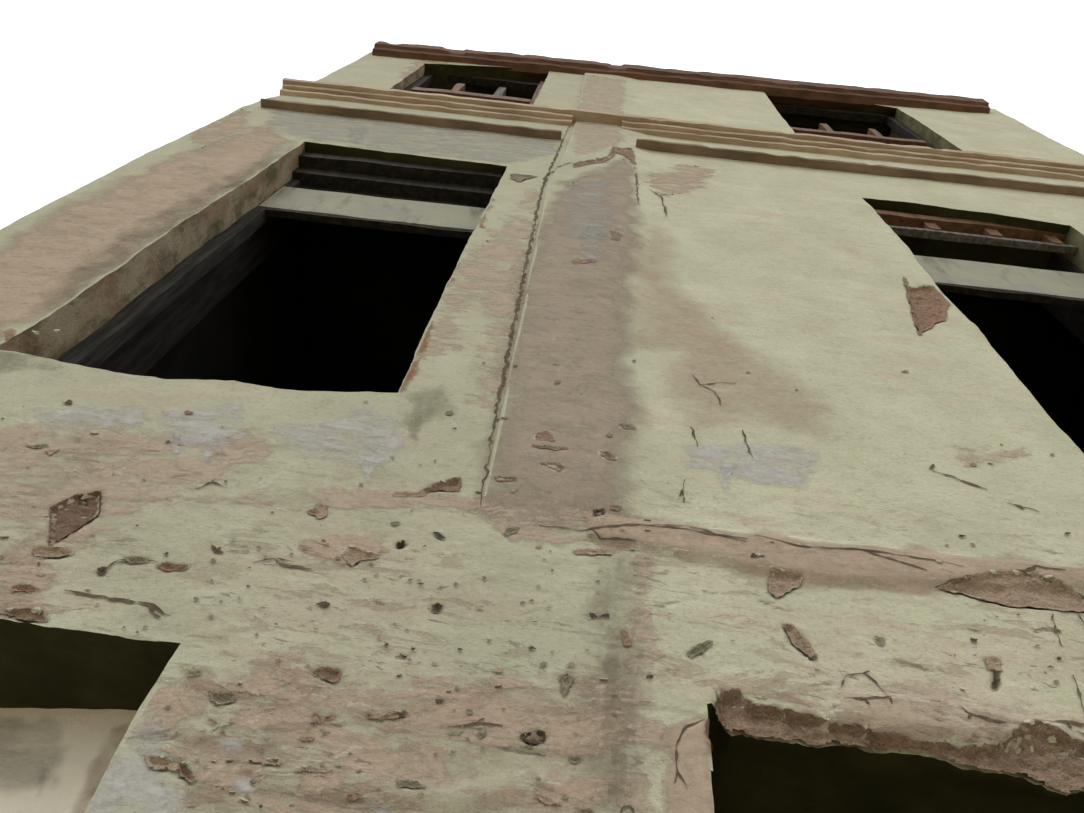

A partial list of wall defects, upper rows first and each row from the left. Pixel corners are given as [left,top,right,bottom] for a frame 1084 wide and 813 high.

crack [480,127,572,505]
peeling [290,76,1084,621]
crack [693,375,727,405]
crack [65,590,171,617]
peeling [0,417,274,622]
crack [540,523,1084,646]
crack [674,719,704,787]
flaking render [662,681,1084,813]